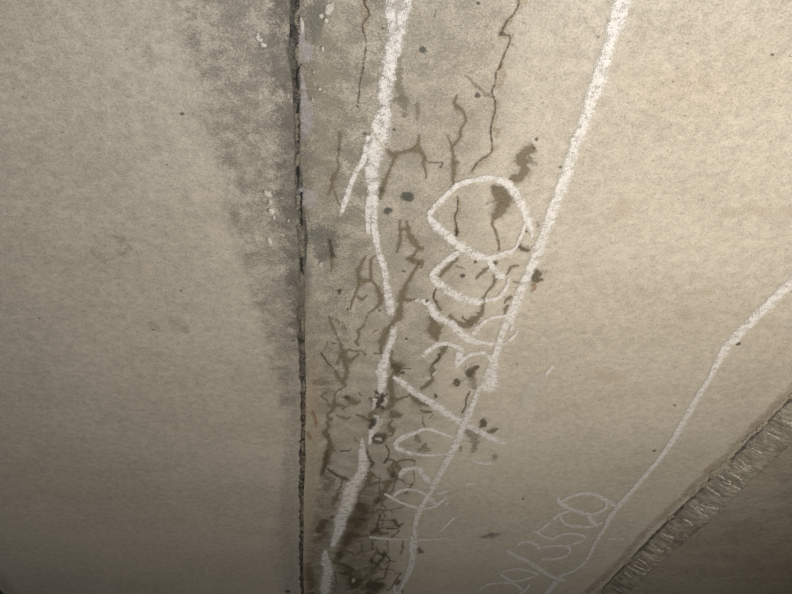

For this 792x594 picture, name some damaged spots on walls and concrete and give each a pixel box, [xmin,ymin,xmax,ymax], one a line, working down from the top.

crack [357,0,371,108]
damp [263,0,325,338]
crack [370,0,520,236]
damp [491,142,535,251]
damp [427,315,443,342]
damp [530,267,544,289]
crack [313,219,519,593]
damp [454,363,480,414]
damp [459,418,498,453]
damp [333,502,370,564]